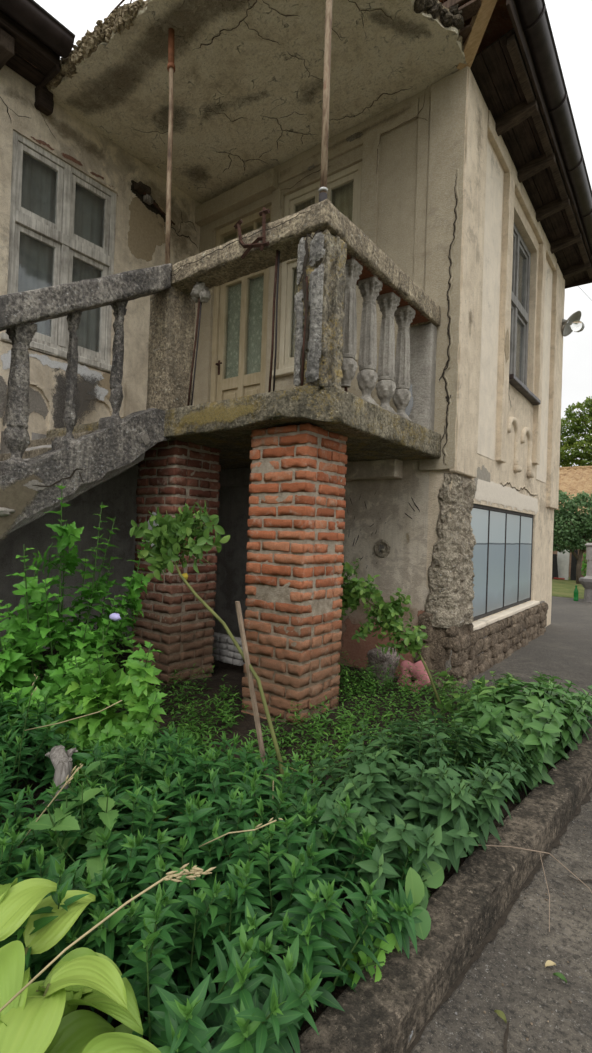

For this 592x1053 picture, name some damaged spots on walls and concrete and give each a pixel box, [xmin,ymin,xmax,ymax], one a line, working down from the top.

spalling [46,0,145,91]
water stain [72,0,244,111]
crack [192,0,322,80]
flaking render [31,136,118,196]
water stain [154,106,187,130]
crack [202,88,426,172]
peeling [128,180,175,262]
crack [439,169,460,465]
peeling [0,350,11,369]
peeling [29,353,111,429]
flaking render [417,473,476,628]
flaking render [341,618,414,676]